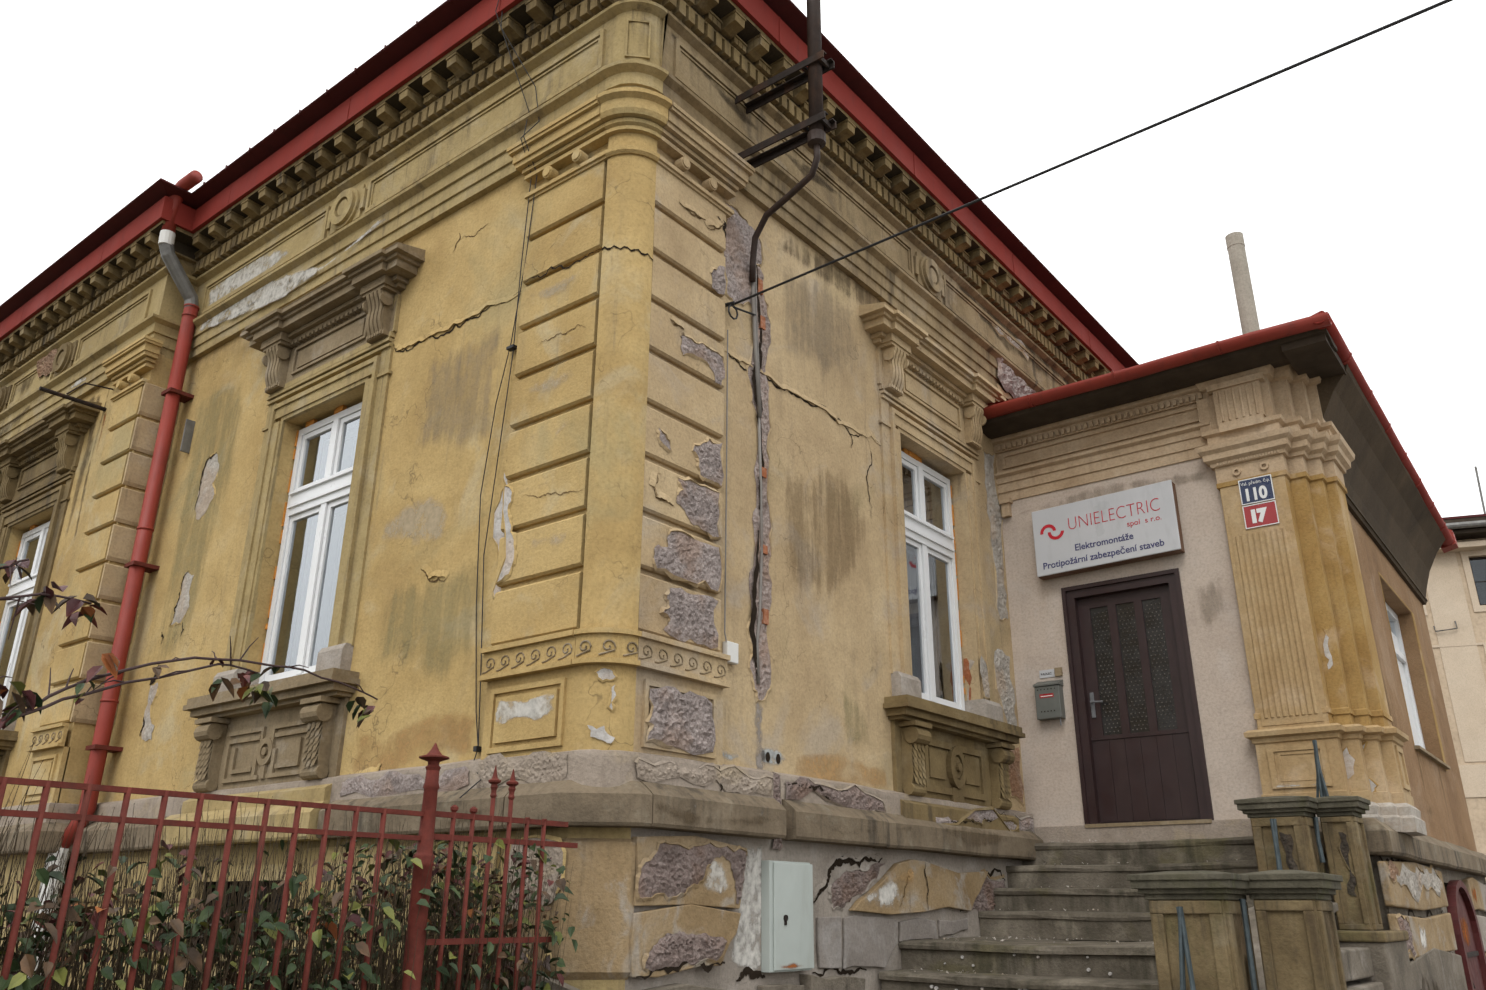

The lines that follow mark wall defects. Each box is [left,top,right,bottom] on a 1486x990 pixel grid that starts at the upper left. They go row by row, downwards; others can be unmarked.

crack [679,199,727,237]
crack [394,245,653,352]
crack [671,315,684,330]
flaking render [680,330,725,385]
flaking render [991,321,1036,400]
flaking render [195,453,219,520]
flaking render [492,469,518,600]
flaking render [652,437,724,649]
crack [724,264,881,703]
flaking render [634,686,886,813]
flaking render [635,839,748,904]
flaking render [1385,860,1443,961]